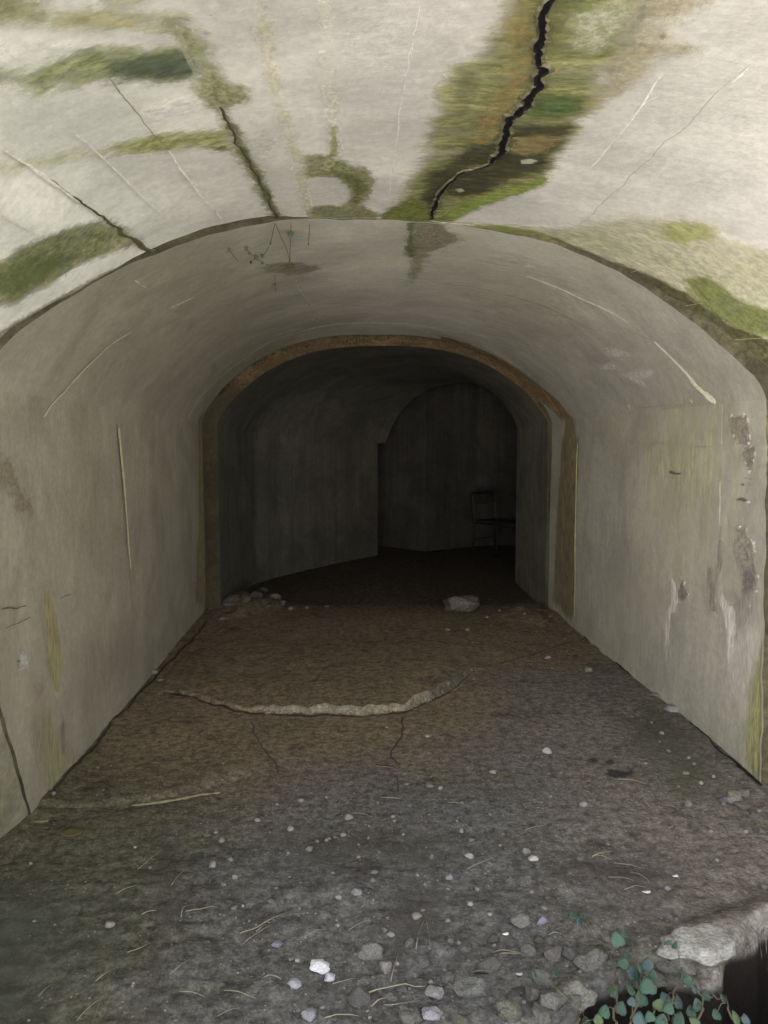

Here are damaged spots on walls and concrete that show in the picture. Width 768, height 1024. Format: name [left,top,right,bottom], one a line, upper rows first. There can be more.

crack [5,150,157,253]
crack [219,107,279,219]
crack [428,0,557,219]
damp [381,0,706,282]
peeling [727,413,756,503]
peeling [706,525,760,647]